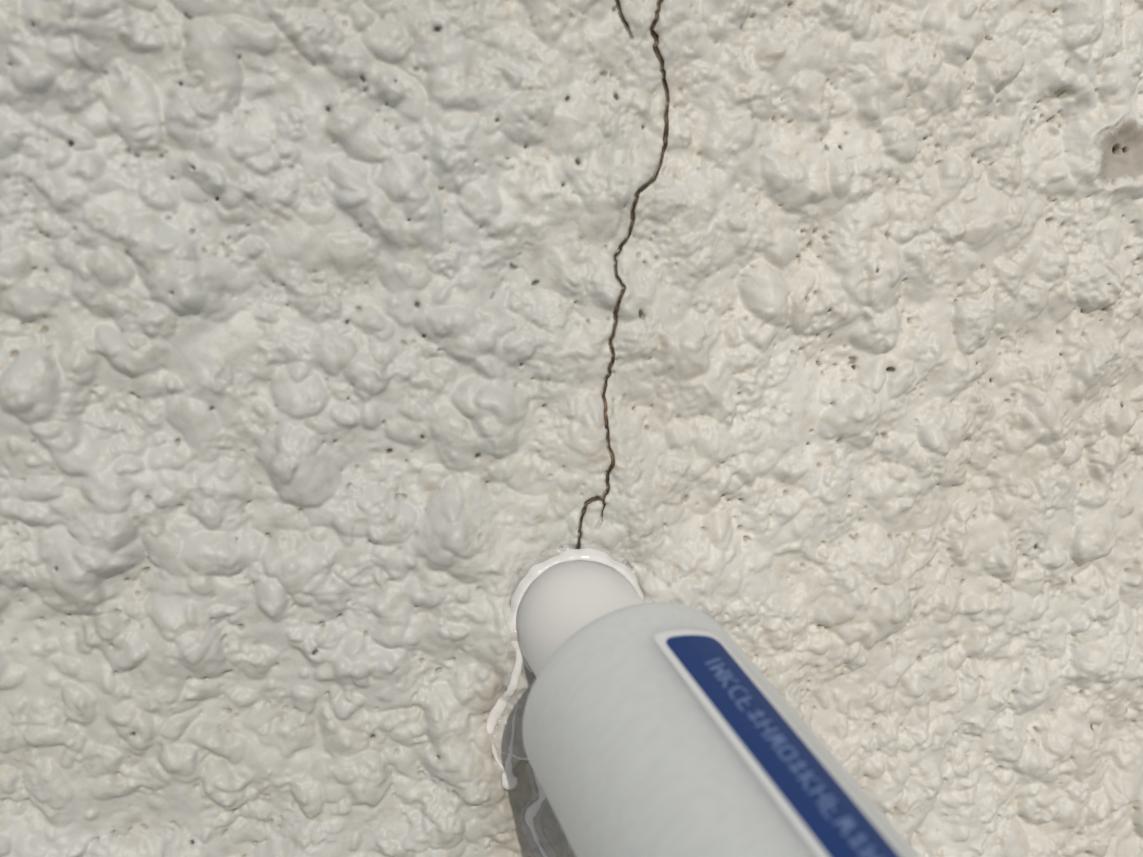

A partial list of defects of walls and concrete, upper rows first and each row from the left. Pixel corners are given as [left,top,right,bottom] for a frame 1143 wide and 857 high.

crack [577,0,670,549]